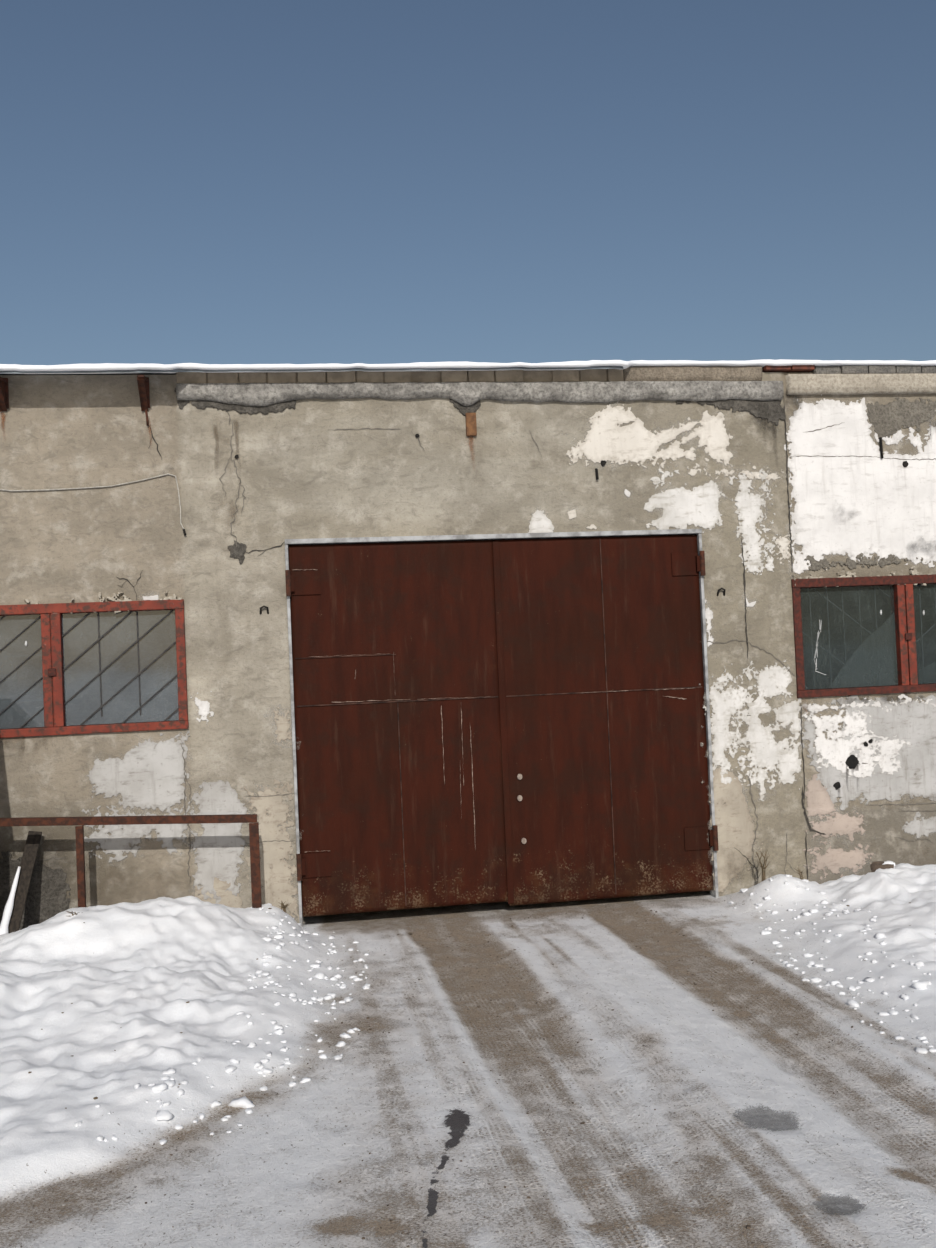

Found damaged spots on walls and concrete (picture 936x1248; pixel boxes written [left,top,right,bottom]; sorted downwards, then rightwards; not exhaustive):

crack [219,411,284,555]
peeling [566,394,936,587]
peeling [82,691,299,920]
peeling [701,660,936,893]